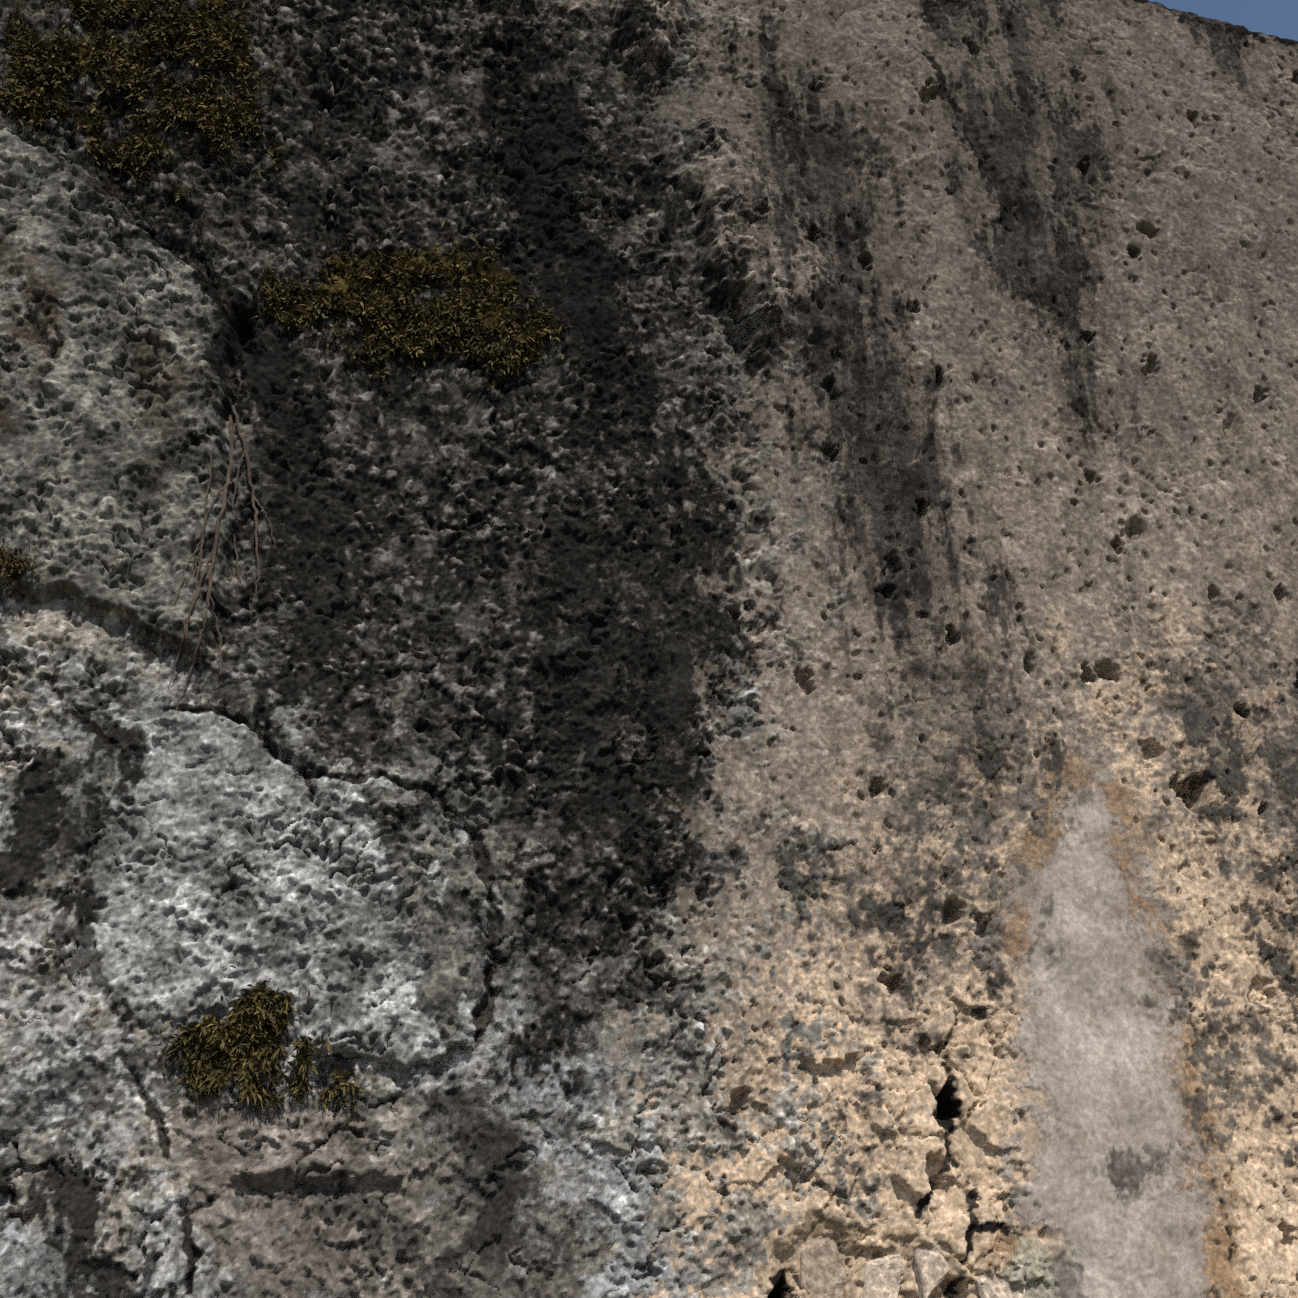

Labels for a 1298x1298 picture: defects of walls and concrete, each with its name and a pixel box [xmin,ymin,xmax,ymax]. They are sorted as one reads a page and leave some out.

water stain [916,0,1142,454]
water stain [0,0,1090,1099]
crack [167,706,497,1048]
water stain [1107,599,1298,1197]
water stain [0,1130,179,1298]
crack [132,1070,170,1179]
crack [177,1197,213,1298]
water stain [295,1062,598,1298]
spalling [756,1210,1026,1298]
spalling [934,1074,962,1135]
crack [914,1035,1021,1298]
peeling [1052,1250,1089,1298]